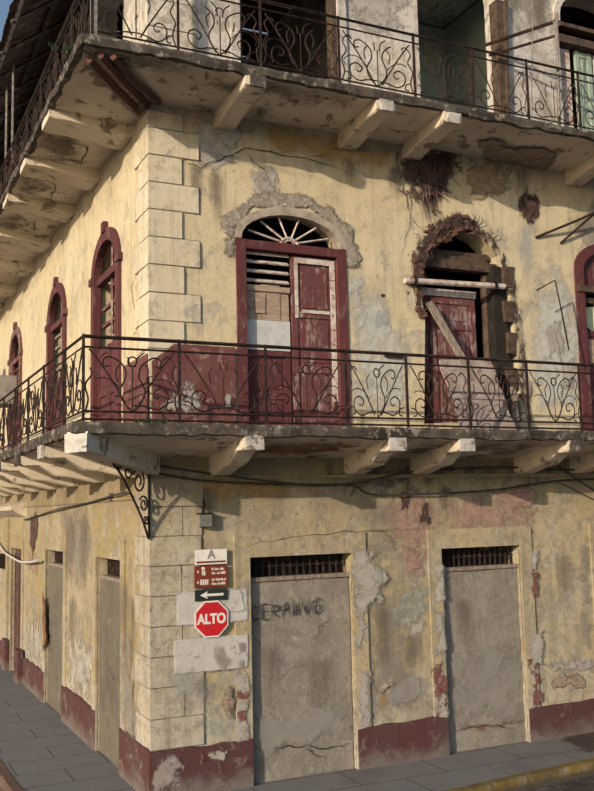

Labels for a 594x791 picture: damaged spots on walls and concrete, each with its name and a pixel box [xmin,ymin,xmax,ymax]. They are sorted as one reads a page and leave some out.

water stain [36,134,88,164]
crack [179,147,353,176]
spalling [393,138,557,319]
peeling [220,165,410,409]
peeling [161,382,201,412]
crack [233,528,421,547]
peeling [384,486,536,576]
peeling [528,549,539,598]
peeling [347,547,450,718]
peeling [527,629,593,706]
peeling [359,671,372,730]
crack [256,743,348,759]